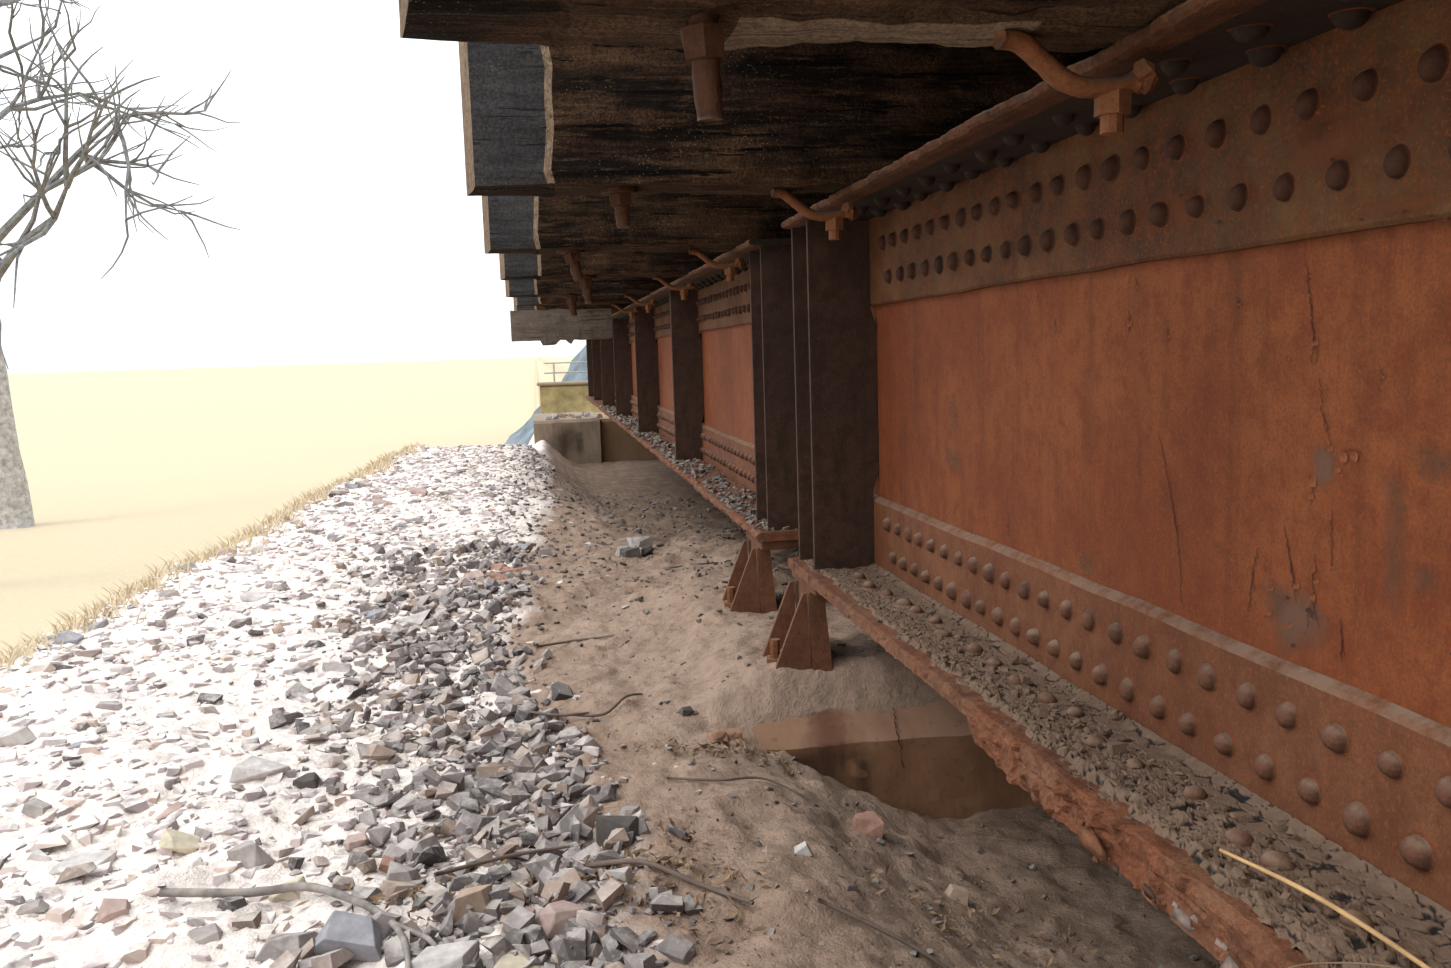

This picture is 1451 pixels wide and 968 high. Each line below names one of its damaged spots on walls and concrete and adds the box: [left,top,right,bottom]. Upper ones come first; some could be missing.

crack [893,707,905,768]
corrosion [1078,818,1109,863]
corrosion [1171,900,1199,932]
corrosion [1215,938,1240,968]